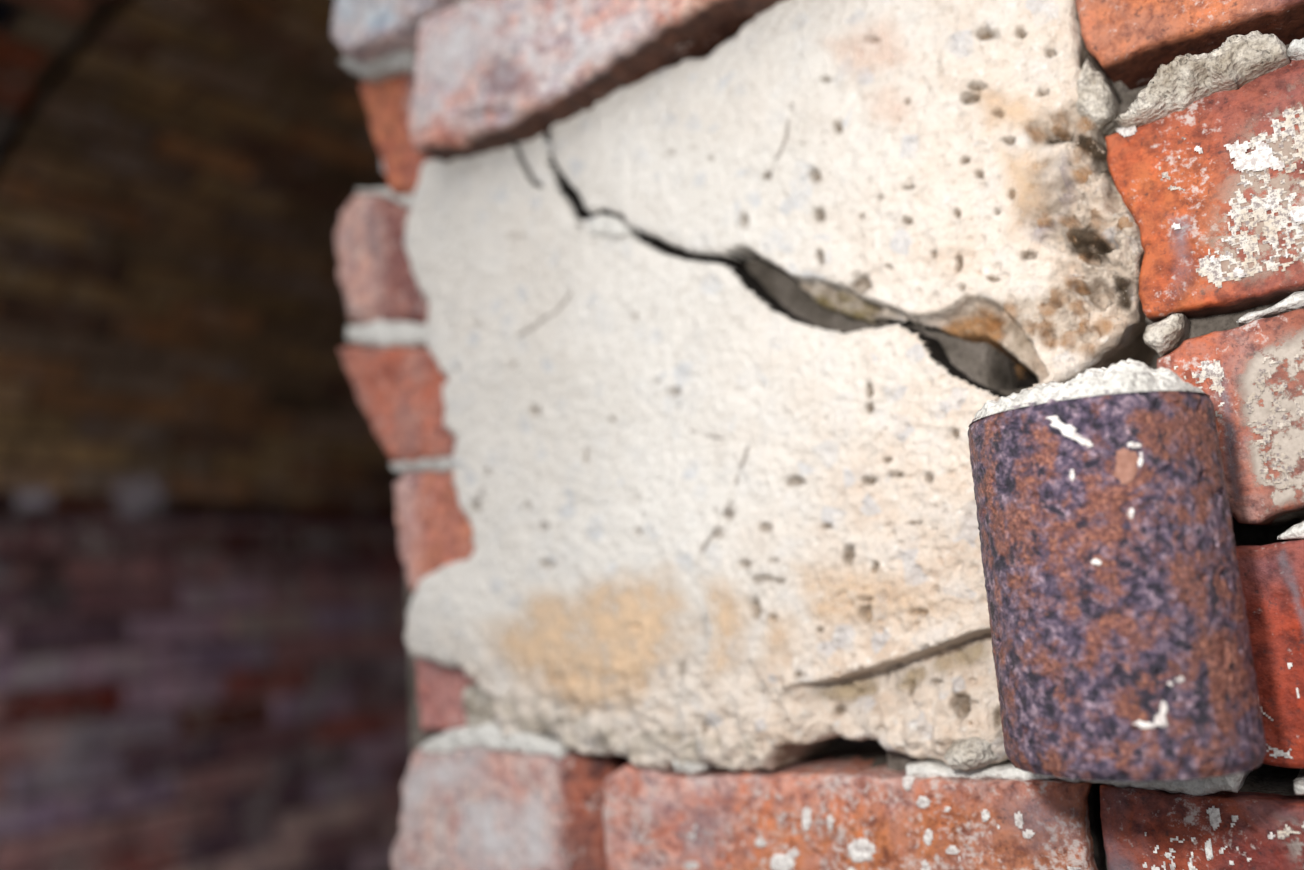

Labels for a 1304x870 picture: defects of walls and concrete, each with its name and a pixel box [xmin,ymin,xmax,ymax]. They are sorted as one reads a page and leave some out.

crack [513,134,1039,397]
crack [765,102,793,178]
water stain [1158,166,1185,191]
water stain [1196,106,1304,288]
corrosion [1113,447,1139,485]
water stain [1174,351,1304,496]